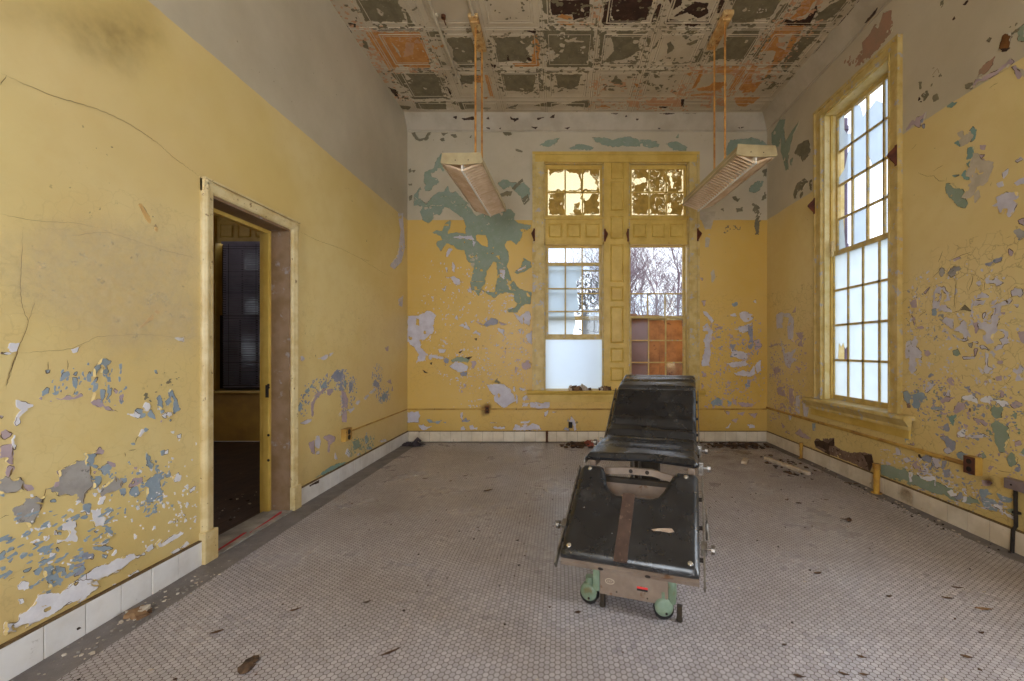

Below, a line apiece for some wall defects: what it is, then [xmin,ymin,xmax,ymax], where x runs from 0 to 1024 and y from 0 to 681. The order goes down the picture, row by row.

peeling [330,0,859,136]
peeling [844,8,894,67]
peeling [905,68,957,131]
peeling [965,56,1024,90]
peeling [390,213,405,270]
crack [5,214,190,384]
peeling [398,132,555,431]
peeling [700,119,1024,520]
peeling [298,365,393,425]
peeling [0,343,197,636]
peeling [309,433,387,487]